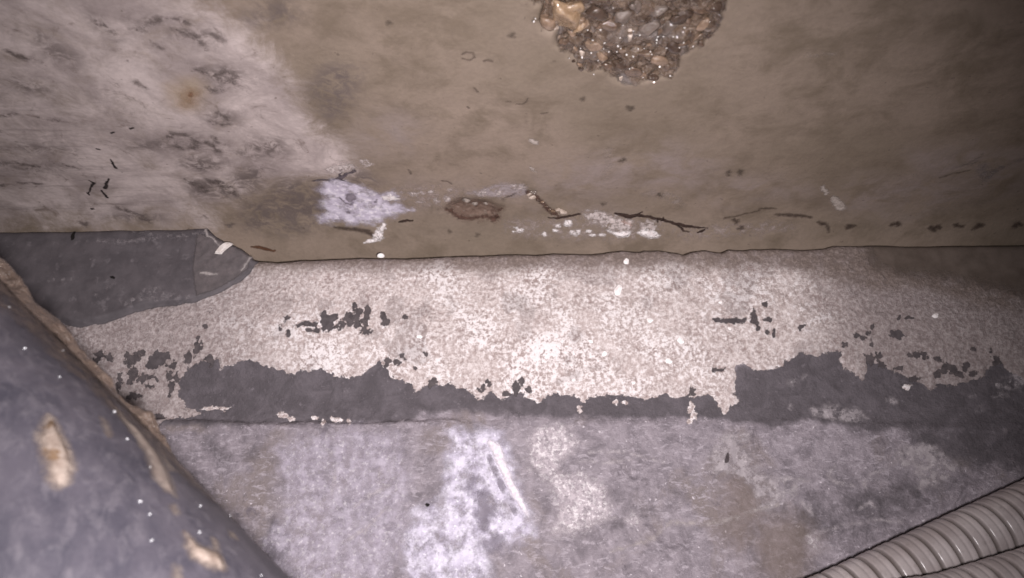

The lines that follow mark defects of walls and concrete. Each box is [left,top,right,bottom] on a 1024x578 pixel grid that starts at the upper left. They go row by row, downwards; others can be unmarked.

spalling [534,0,727,86]
damp [87,159,117,198]
damp [319,160,457,243]
damp [474,185,526,196]
damp [511,210,663,239]
flaking render [0,228,1024,426]
damp [263,428,532,578]